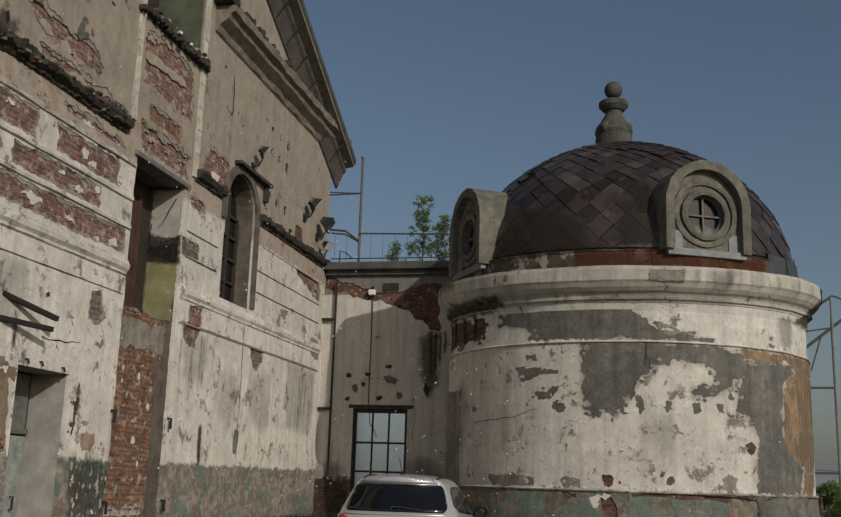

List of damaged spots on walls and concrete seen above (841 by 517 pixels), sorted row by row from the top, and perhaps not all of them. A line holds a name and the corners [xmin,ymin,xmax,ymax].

flaking render [0,0,128,253]
flaking render [141,30,194,181]
flaking render [88,290,106,325]
flaking render [183,305,202,349]
flaking render [296,269,442,332]
flaking render [451,318,489,354]
flaking render [0,355,18,452]
peeling [66,384,107,517]
flaking render [344,372,371,401]
flaking render [736,343,814,496]
flaking render [589,474,621,517]
flaking render [631,471,757,517]